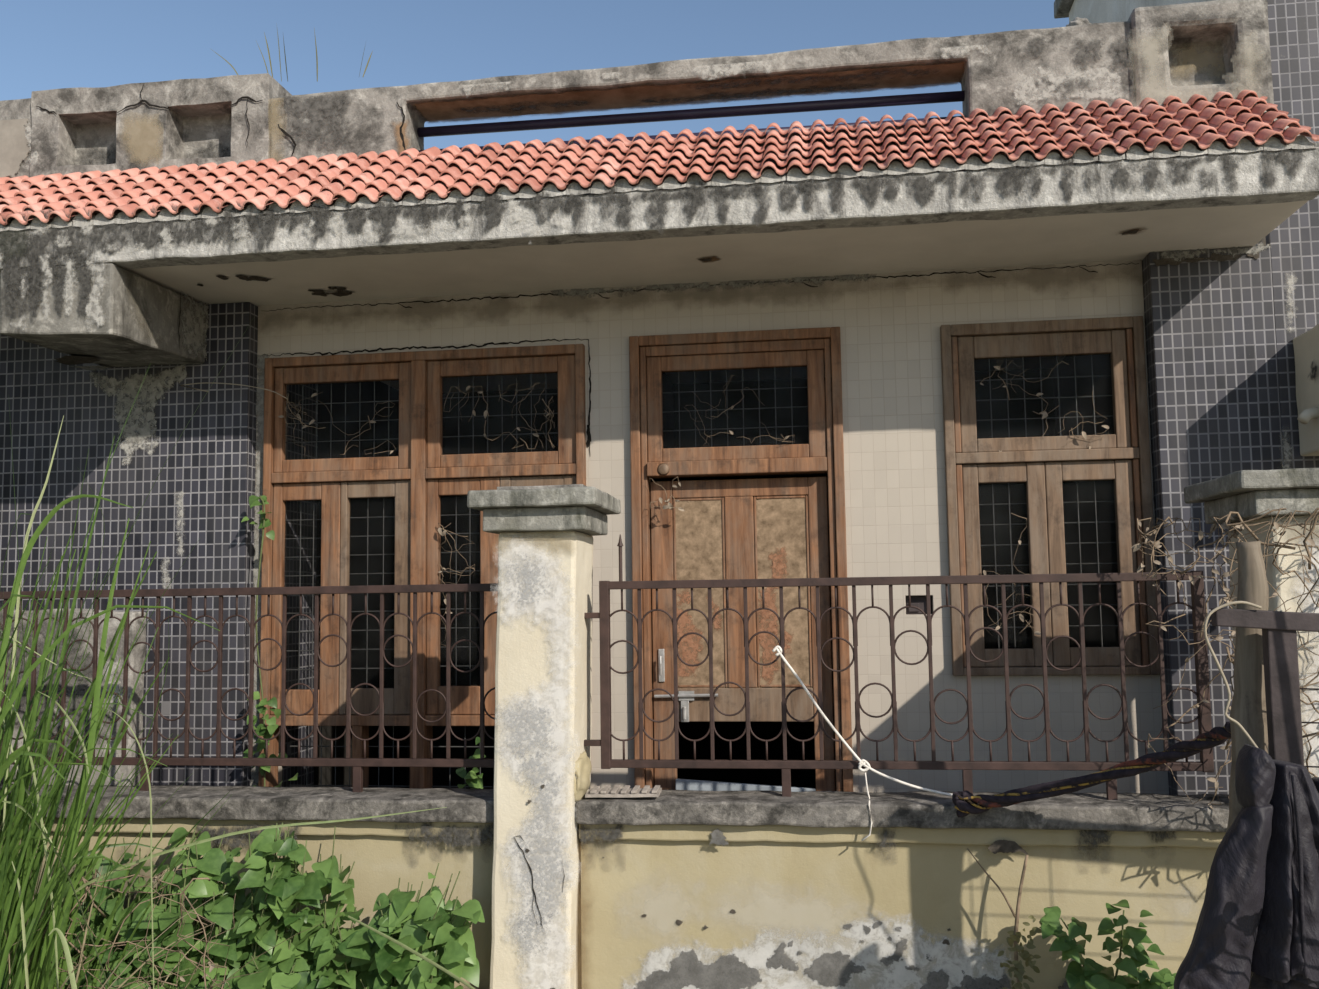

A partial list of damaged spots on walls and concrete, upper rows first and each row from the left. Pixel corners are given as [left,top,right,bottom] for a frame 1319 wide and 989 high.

leakage [83,148,116,165]
crack [117,87,170,113]
leakage [200,140,231,158]
crack [230,96,296,156]
leakage [282,95,350,150]
crack [396,102,406,150]
leakage [1263,149,1304,187]
leakage [220,153,1247,251]
leakage [1,252,104,330]
spalling [308,287,352,297]
crack [514,835,565,929]
peeling [624,918,1011,989]